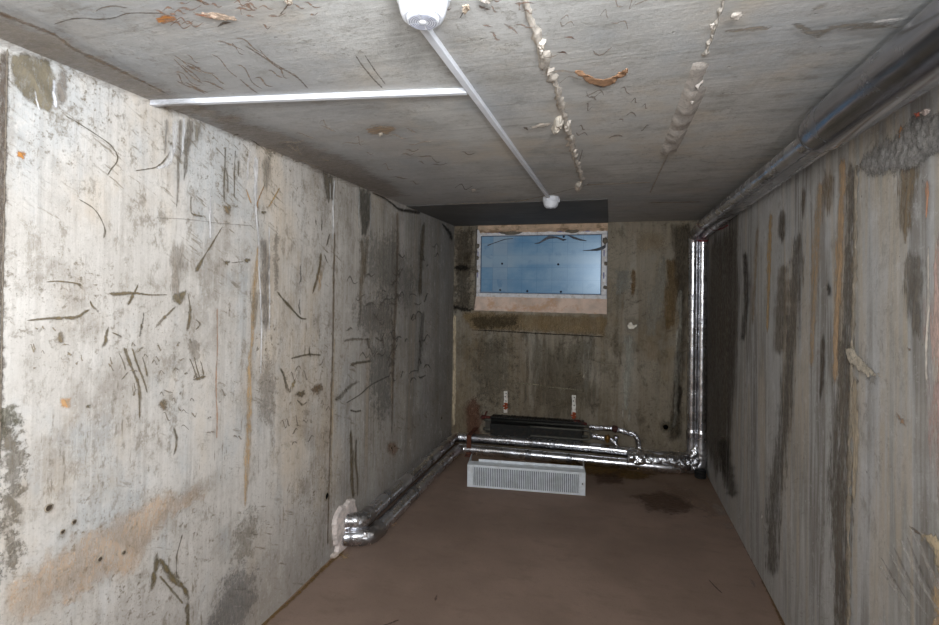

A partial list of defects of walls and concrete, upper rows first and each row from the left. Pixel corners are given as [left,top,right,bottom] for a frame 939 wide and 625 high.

peeling [194,0,237,27]
peeling [460,0,493,18]
crack [601,0,647,28]
crack [542,15,647,161]
water stain [453,227,606,334]
rust [244,248,258,505]
water stain [0,405,30,569]
spalling [910,527,939,625]